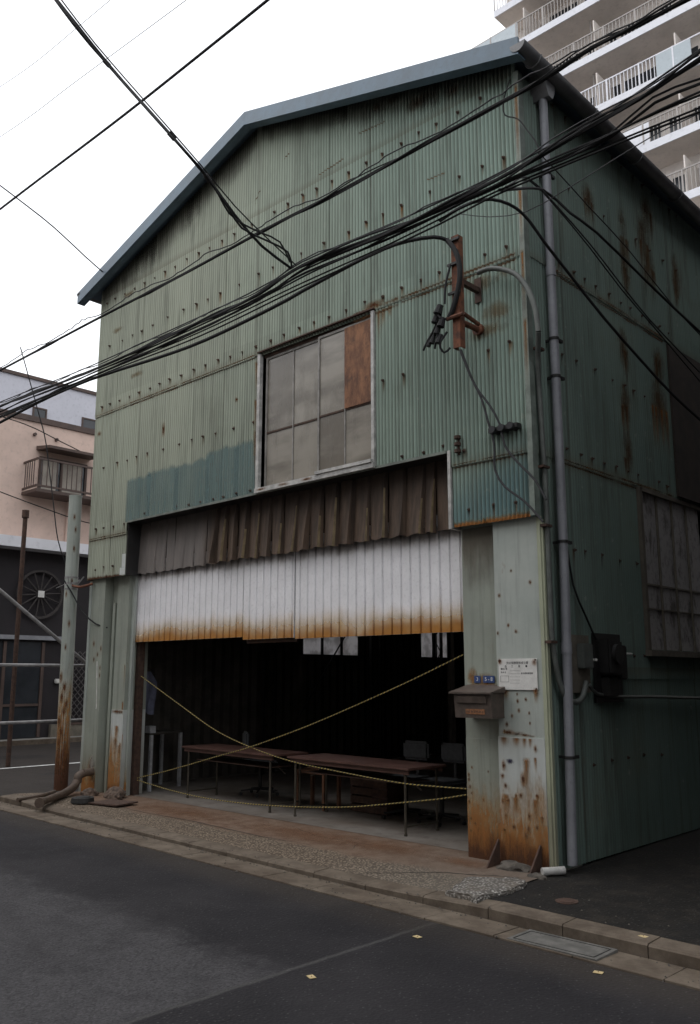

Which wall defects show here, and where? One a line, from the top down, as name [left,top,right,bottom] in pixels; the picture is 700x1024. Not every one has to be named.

rust [619,200,679,297]
rust [556,263,668,430]
rust [135,615,464,642]
rust [54,674,71,791]
rust [81,726,126,791]
rust [454,689,550,876]